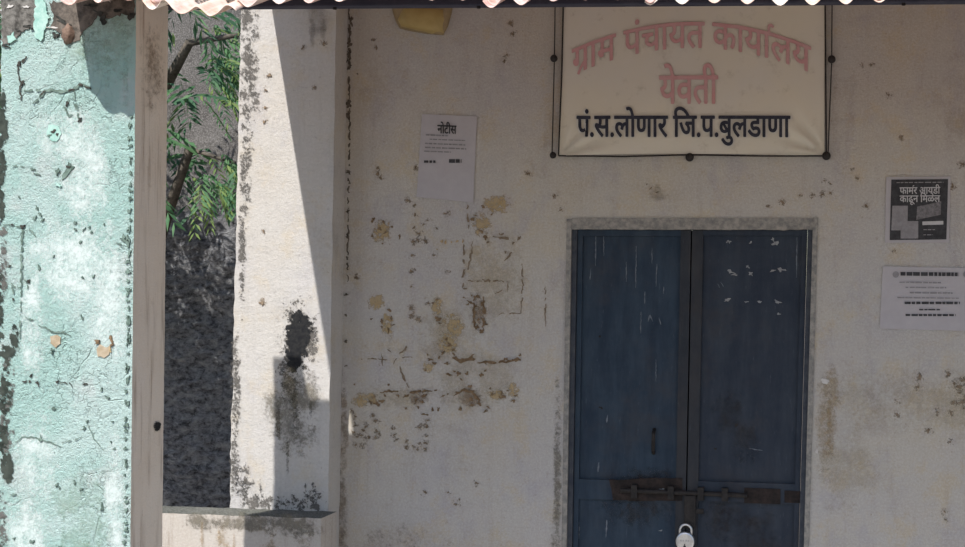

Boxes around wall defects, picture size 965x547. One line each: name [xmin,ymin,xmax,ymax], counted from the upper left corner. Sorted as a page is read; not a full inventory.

peeling [371,199,464,274]
peeling [470,196,507,243]
spalling [50,335,61,354]
damp [267,300,319,468]
peeling [350,295,519,451]
peeling [936,371,965,416]
crack [16,425,101,448]
damp [190,335,321,536]